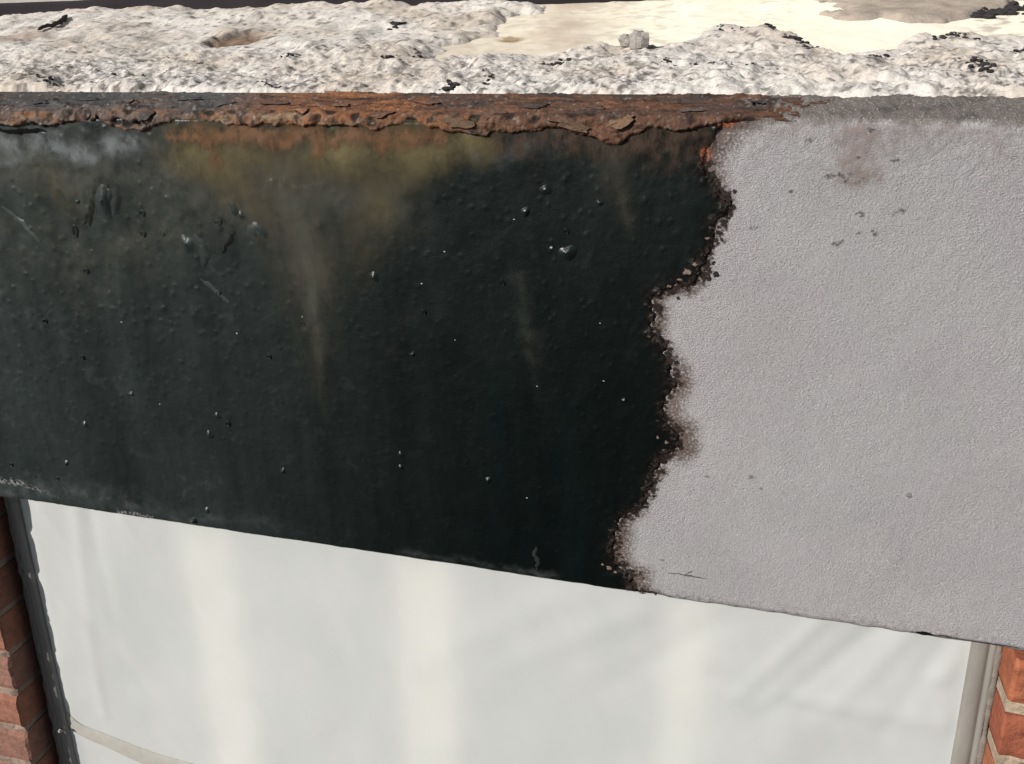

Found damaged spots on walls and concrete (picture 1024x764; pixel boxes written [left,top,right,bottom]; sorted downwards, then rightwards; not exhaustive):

water stain [185,133,483,292]
rust [0,91,830,190]
peeling [601,159,737,597]